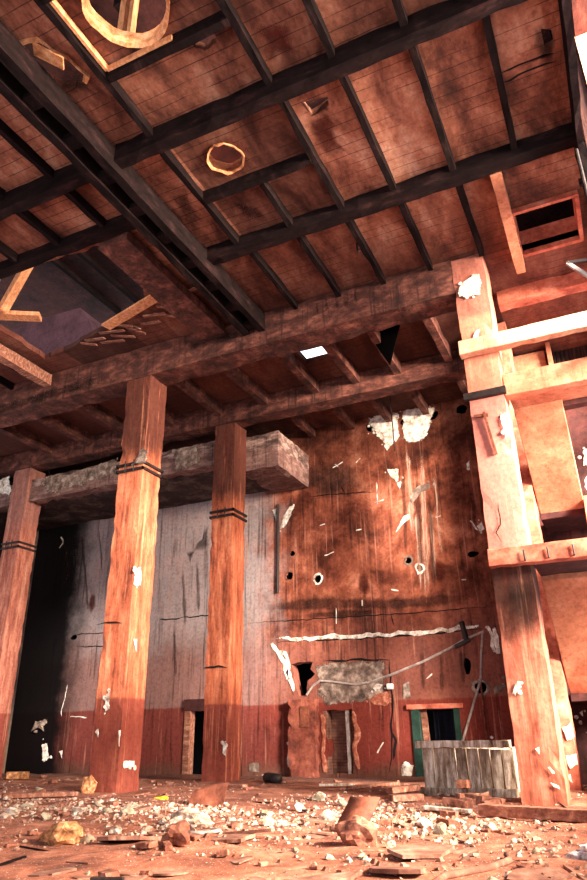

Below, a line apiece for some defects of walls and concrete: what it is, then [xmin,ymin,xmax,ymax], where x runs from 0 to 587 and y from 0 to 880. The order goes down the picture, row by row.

peeling [458,274,481,299]
flaking render [366,406,438,450]
spalling [0,476,12,495]
spalling [270,625,501,691]
flaking render [403,682,411,699]
flaking render [316,660,391,773]